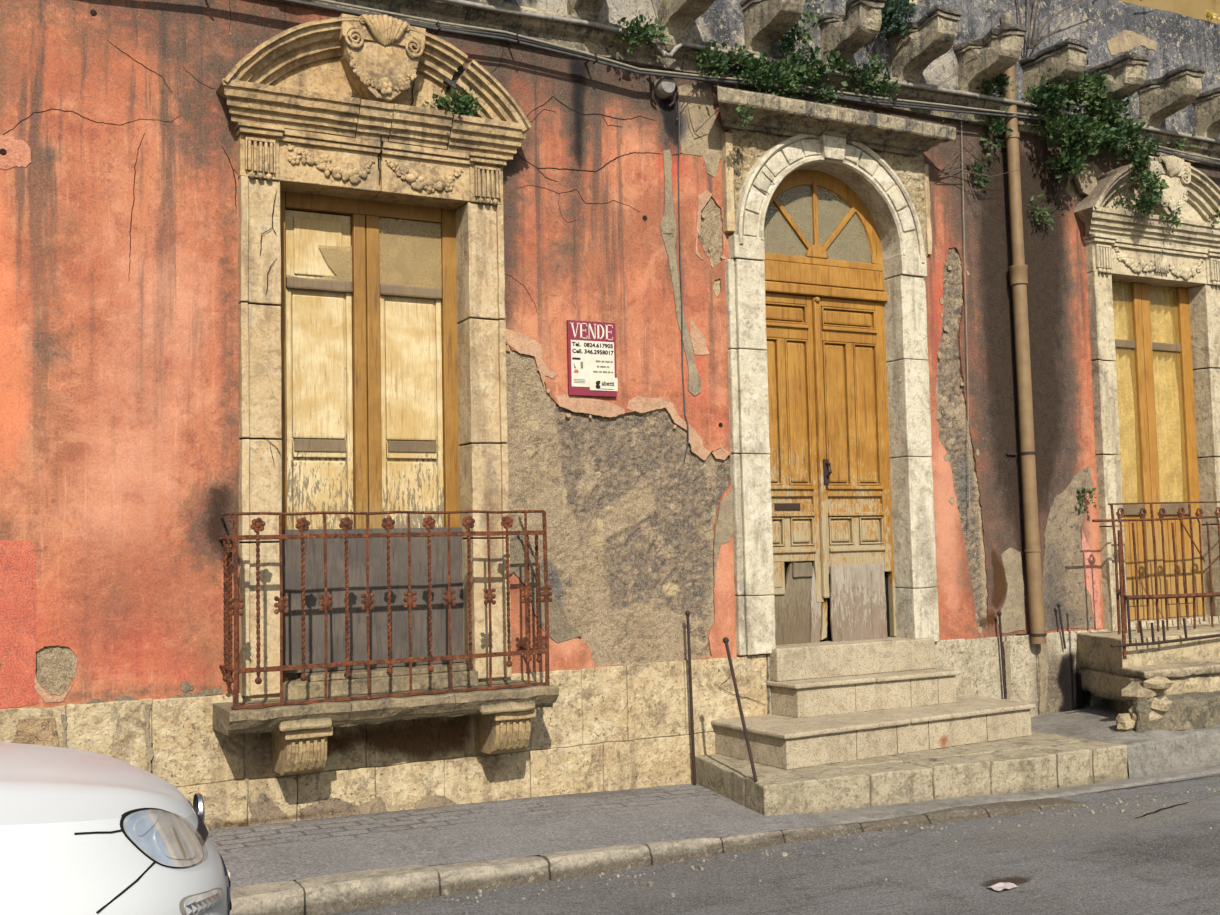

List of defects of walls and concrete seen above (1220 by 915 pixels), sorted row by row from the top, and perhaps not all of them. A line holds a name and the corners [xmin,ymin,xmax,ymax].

crack [3,40,214,273]
crack [516,96,720,223]
flaking render [677,82,726,296]
flaking render [502,329,733,666]
peeling [690,315,710,355]
flaking render [932,248,989,634]
damp [981,552,1006,627]
damp [982,149,1061,551]